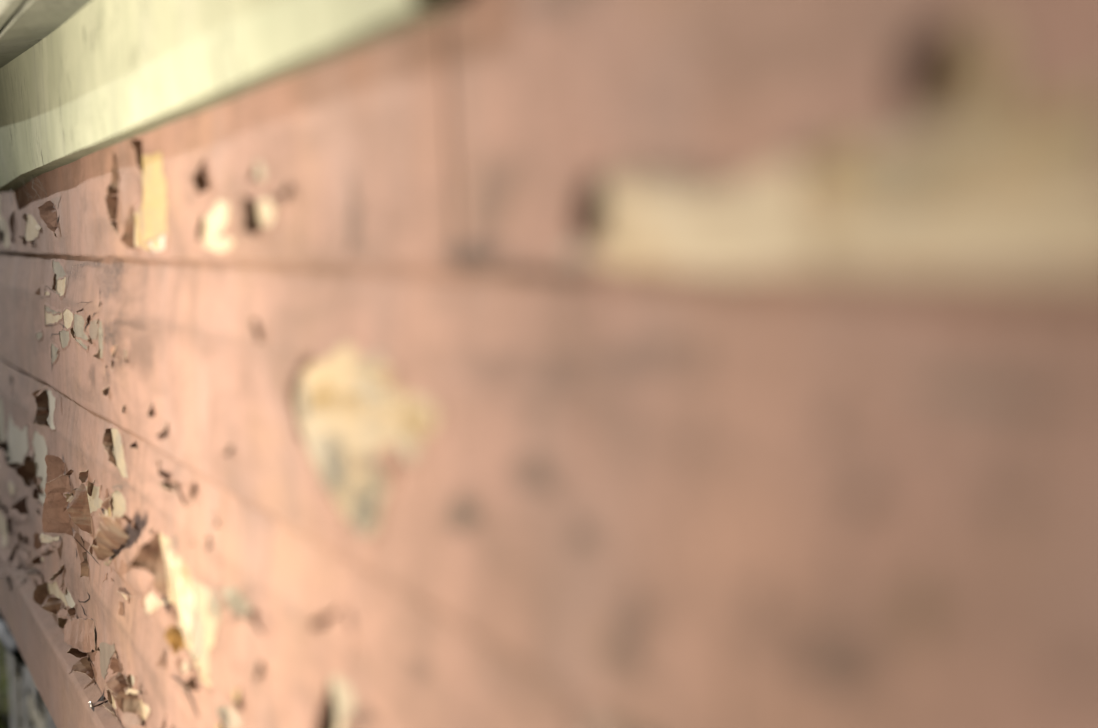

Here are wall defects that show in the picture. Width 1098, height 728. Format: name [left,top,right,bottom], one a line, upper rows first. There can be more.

peeling [0,192,61,251]
peeling [105,139,170,257]
peeling [191,156,292,257]
peeling [571,11,1098,275]
peeling [36,258,128,369]
peeling [287,337,443,545]
peeling [0,375,263,728]
peeling [315,670,372,728]